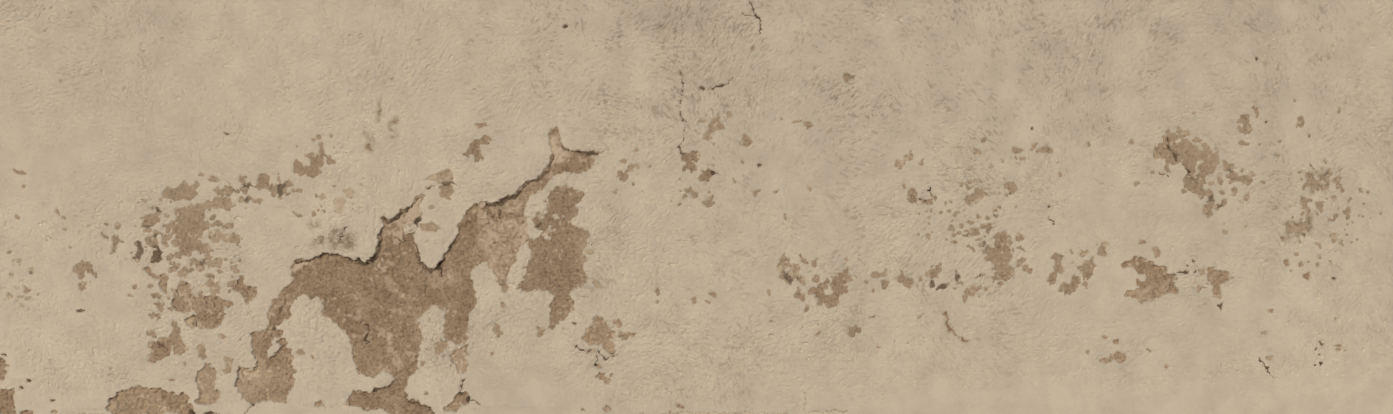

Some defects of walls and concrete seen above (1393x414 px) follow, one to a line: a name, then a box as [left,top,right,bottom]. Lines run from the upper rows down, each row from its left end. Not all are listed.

peeling [613,148,652,195]
peeling [1001,127,1053,163]
peeling [1134,112,1265,235]
peeling [1233,106,1282,158]
peeling [55,209,97,312]
spalling [101,123,636,414]
peeling [767,134,1033,337]
peeling [1047,242,1109,295]
spalling [1121,240,1178,304]
spalling [1197,267,1228,310]
peeling [1280,160,1382,280]
spalling [0,354,34,414]